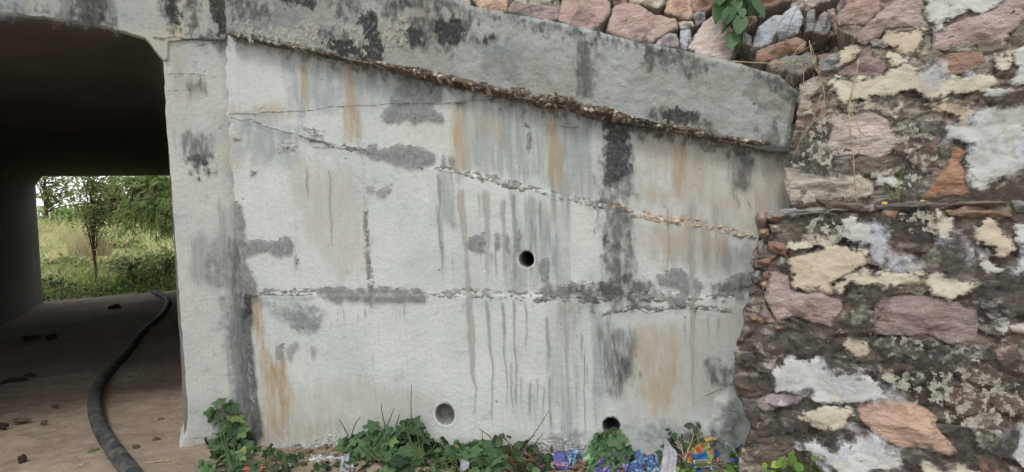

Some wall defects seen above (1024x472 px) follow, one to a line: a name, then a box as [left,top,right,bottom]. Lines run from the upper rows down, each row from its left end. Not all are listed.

damp [160,0,478,81]
spalling [228,32,782,152]
damp [183,132,212,180]
damp [233,245,262,446]
crack [229,96,494,290]
peeling [315,286,427,305]
damp [457,190,477,403]
damp [478,192,516,271]
damp [485,302,551,424]
peeling [622,268,702,308]
damp [491,96,856,308]